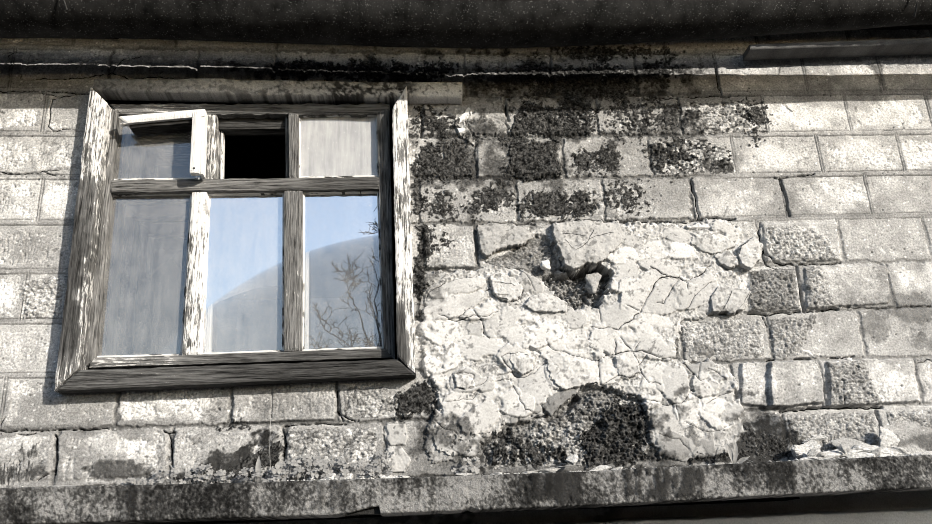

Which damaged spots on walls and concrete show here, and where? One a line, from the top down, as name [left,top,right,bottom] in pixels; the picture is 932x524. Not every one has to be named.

crack [0,57,174,132]
crack [564,183,733,249]
crack [427,269,533,339]
crack [723,226,930,326]
crack [447,266,731,449]
peeling [416,218,932,469]
crack [782,398,880,428]
crack [0,418,113,481]
damp [518,471,587,504]